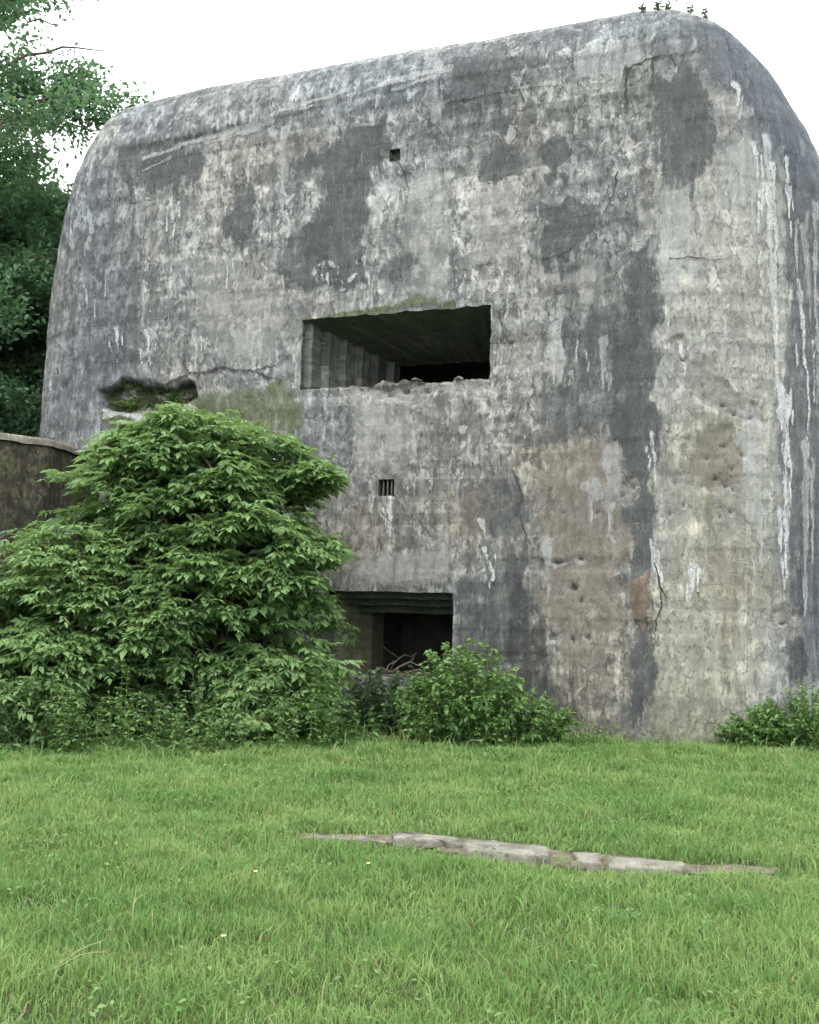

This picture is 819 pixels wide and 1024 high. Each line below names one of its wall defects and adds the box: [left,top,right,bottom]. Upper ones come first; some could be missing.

crack [624,45,704,105]
spalling [104,381,198,417]
crack [165,352,289,386]
leakage [649,22,819,688]
leakage [610,234,688,728]
crack [652,564,666,648]